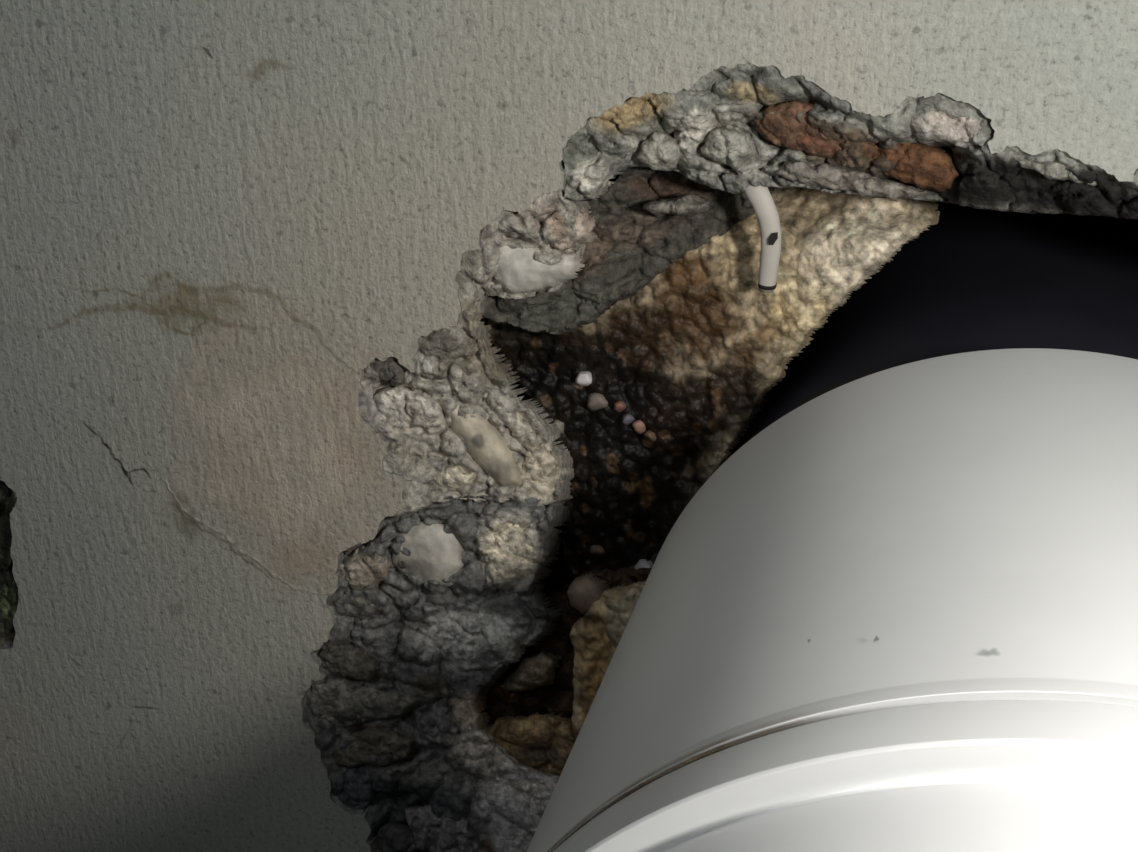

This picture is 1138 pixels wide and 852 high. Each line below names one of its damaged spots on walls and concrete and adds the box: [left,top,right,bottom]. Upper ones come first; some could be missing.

crack [84,422,151,482]
spalling [302,63,1138,852]
spalling [0,480,19,648]